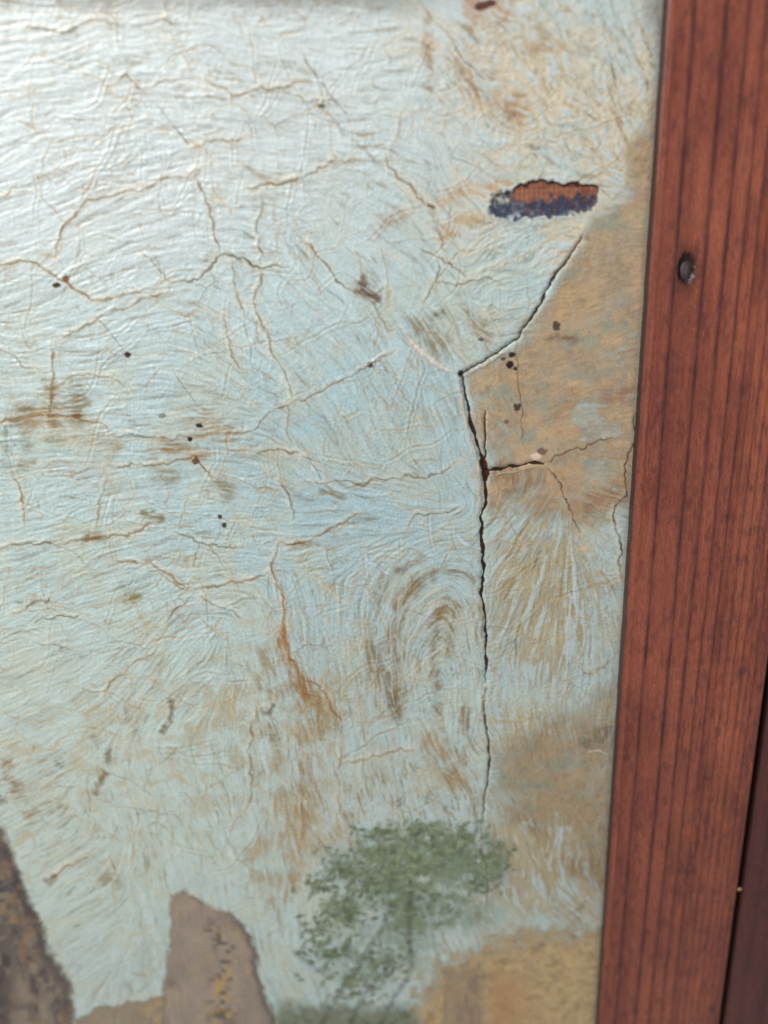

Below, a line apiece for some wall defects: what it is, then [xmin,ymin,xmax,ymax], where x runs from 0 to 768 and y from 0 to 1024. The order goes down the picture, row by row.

peeling [489,179,598,222]
crack [459,236,606,819]